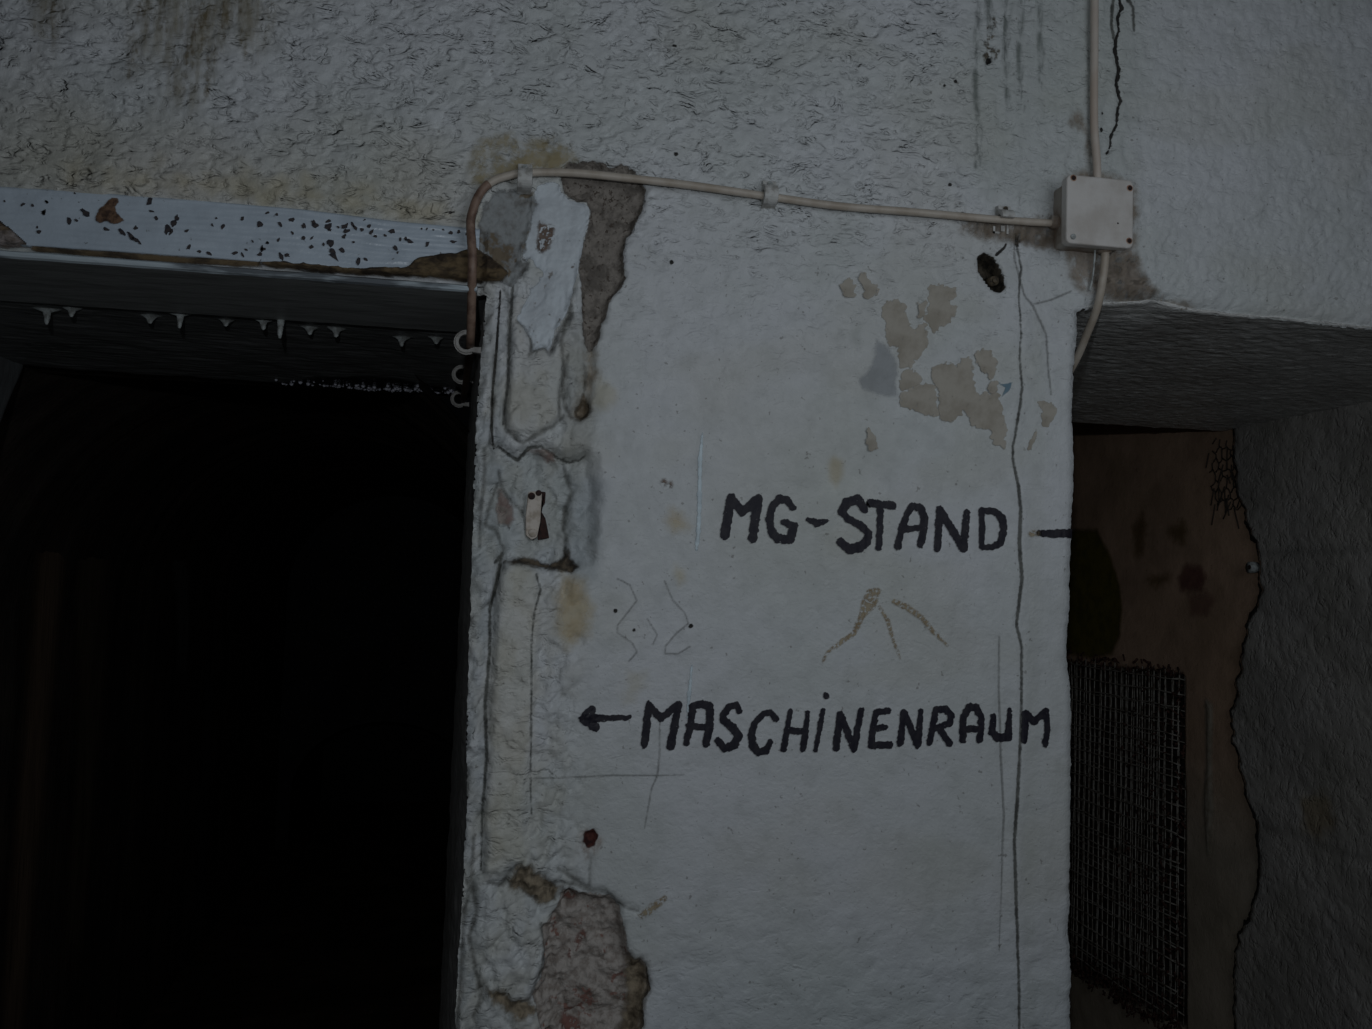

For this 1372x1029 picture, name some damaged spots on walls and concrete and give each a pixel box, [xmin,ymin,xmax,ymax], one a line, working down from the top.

crack [1105,0,1135,154]
spalling [0,200,49,249]
peeling [103,225,141,245]
peeling [146,197,212,256]
flaking render [211,189,538,287]
spalling [561,161,646,414]
peeling [839,272,1008,451]
peeling [1027,401,1057,450]
spalling [488,865,651,1029]